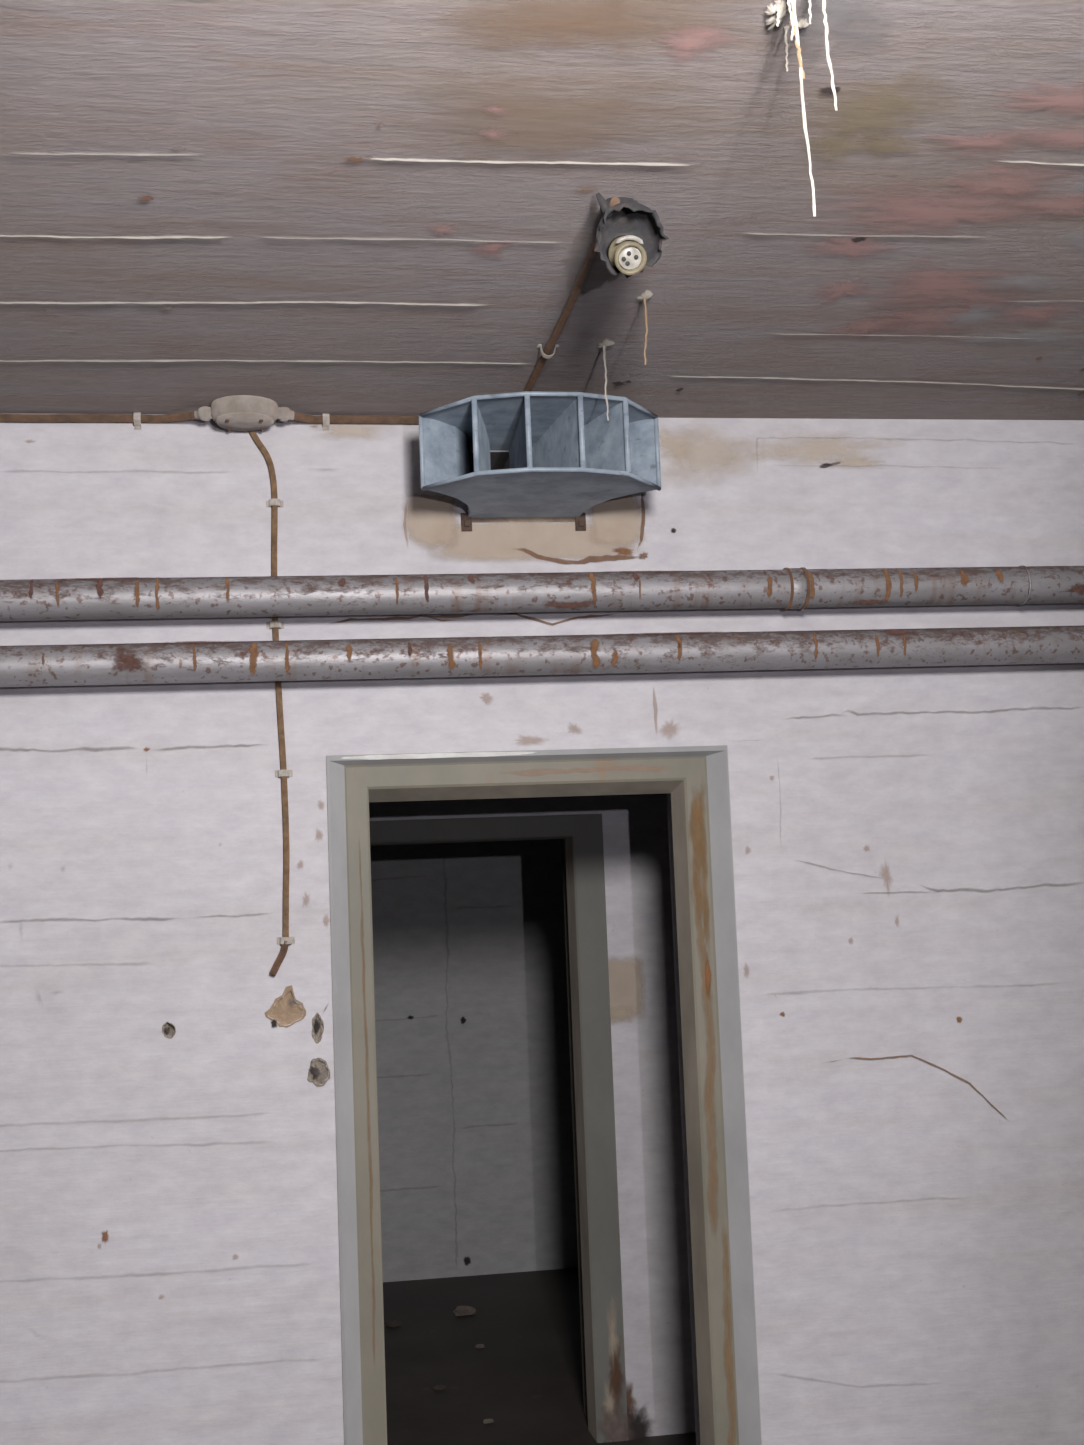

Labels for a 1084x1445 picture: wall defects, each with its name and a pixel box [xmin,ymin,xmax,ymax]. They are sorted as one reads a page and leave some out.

rust [694,804,711,1012]
spalling [265,985,330,1087]
crack [831,1055,1005,1117]